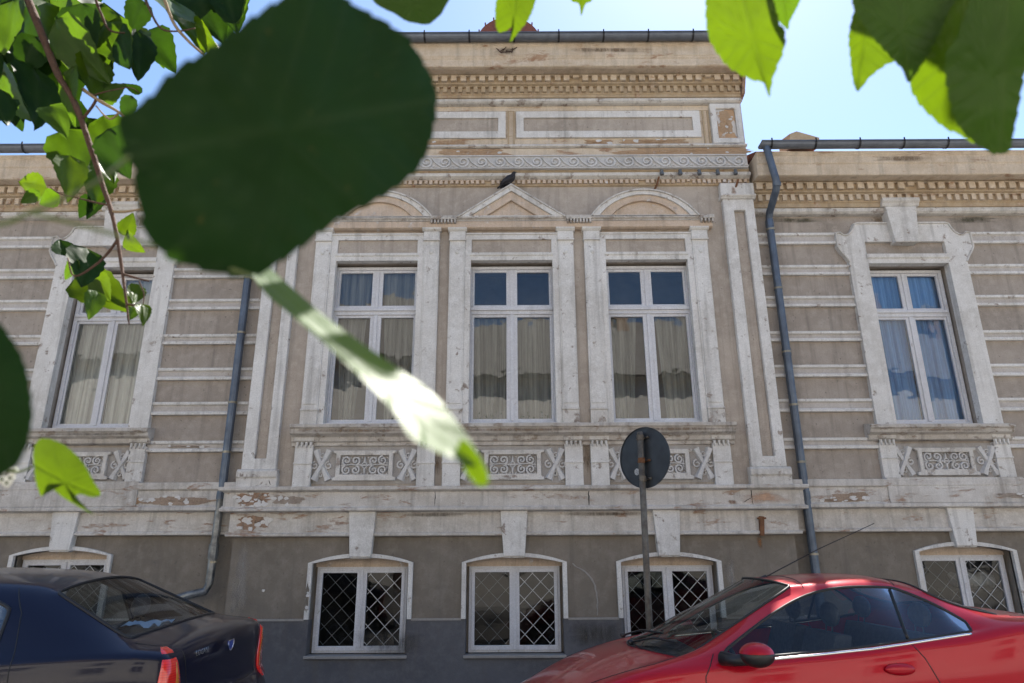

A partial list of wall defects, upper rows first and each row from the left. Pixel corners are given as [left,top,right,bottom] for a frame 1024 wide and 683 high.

flaking render [719,111,733,134]
peeling [136,495,216,506]
flaking render [232,492,305,531]
peeling [818,492,870,502]